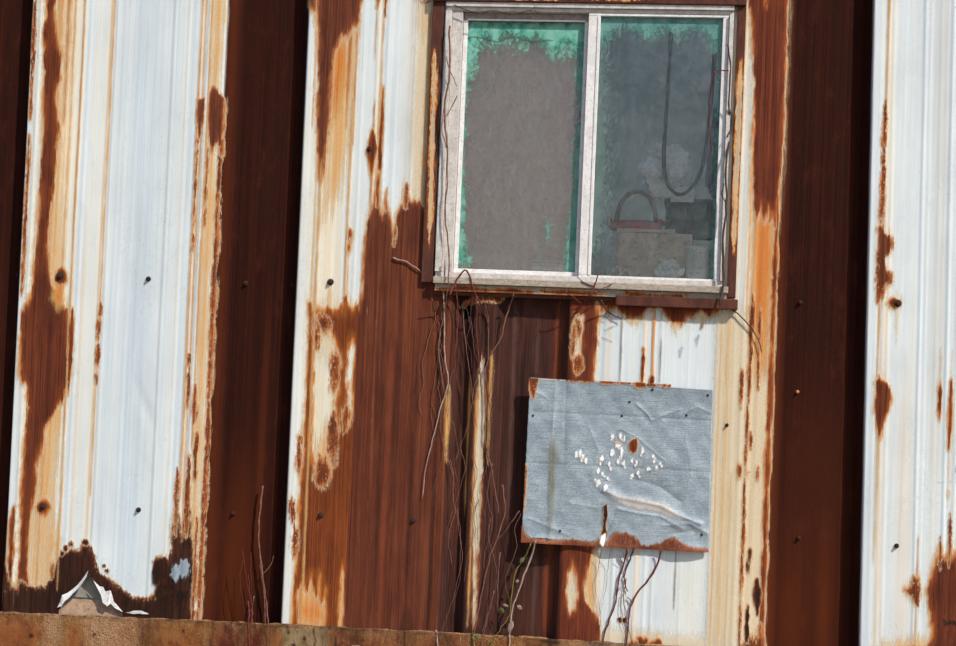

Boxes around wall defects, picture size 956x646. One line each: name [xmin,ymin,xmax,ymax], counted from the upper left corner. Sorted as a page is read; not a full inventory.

rust [15,0,86,589]
rust [139,0,789,646]
rust [873,0,902,546]
rust [881,511,956,646]
rust [937,377,954,451]